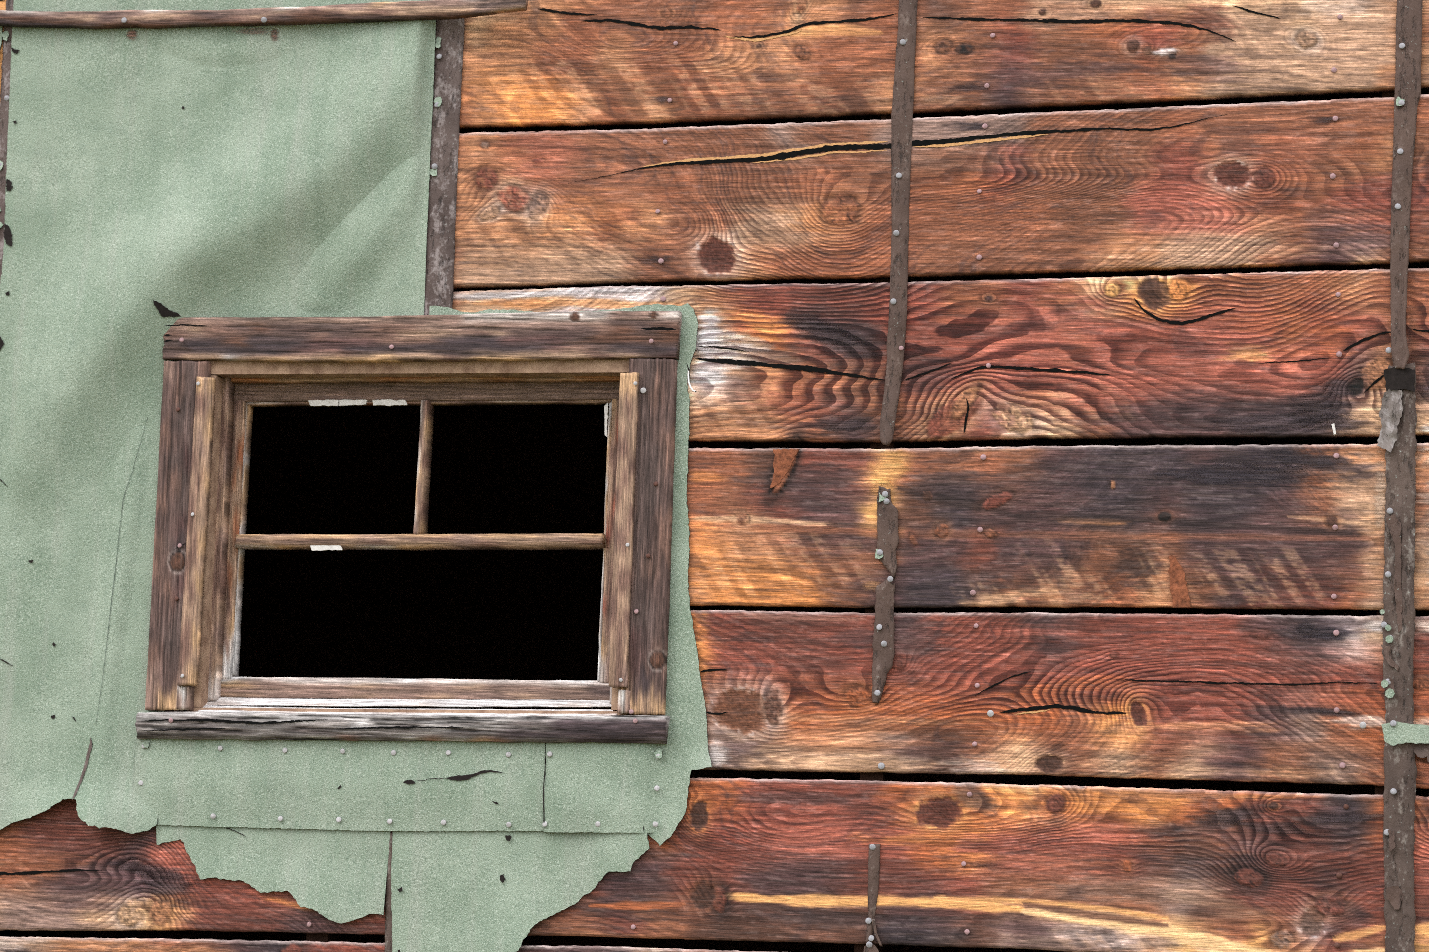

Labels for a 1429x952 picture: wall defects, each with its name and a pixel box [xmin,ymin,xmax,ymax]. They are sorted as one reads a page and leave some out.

crack [537,5,1281,42]
crack [574,114,1227,182]
crack [1134,298,1235,325]
crack [1258,329,1429,364]
crack [1365,375,1384,392]
crack [975,671,1377,715]